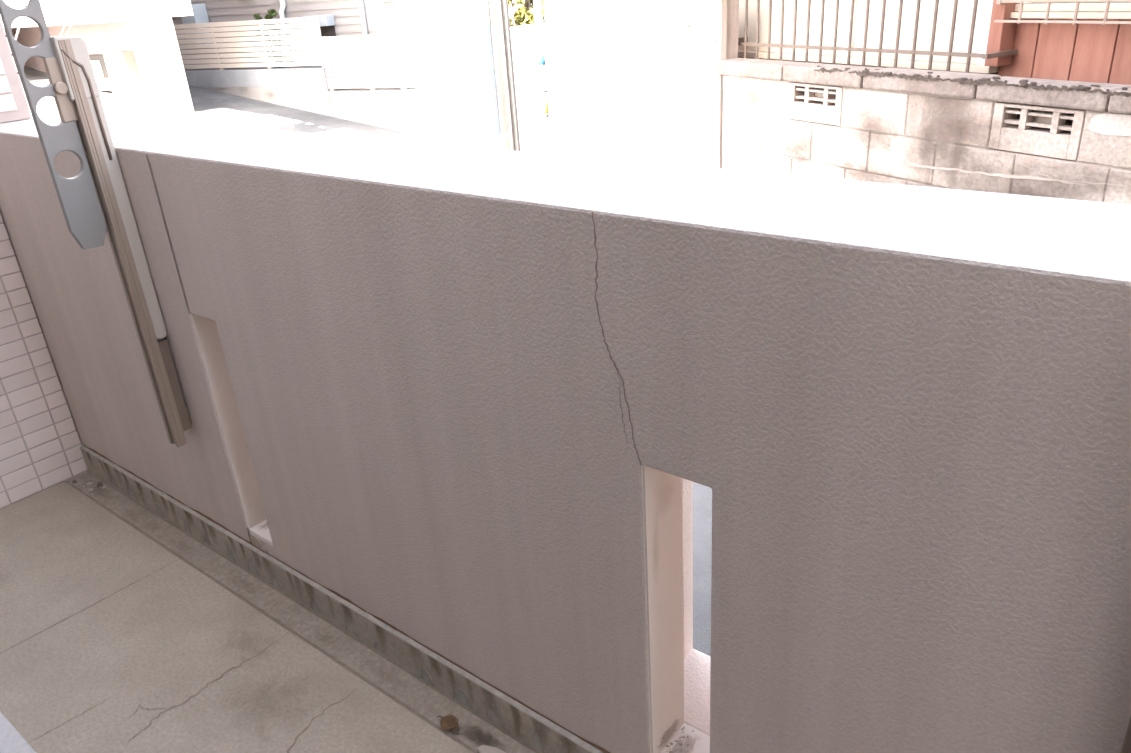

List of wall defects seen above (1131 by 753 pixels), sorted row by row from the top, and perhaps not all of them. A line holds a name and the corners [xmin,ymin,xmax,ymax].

crack [592,212,642,466]
crack [126,633,288,746]
crack [287,689,357,753]